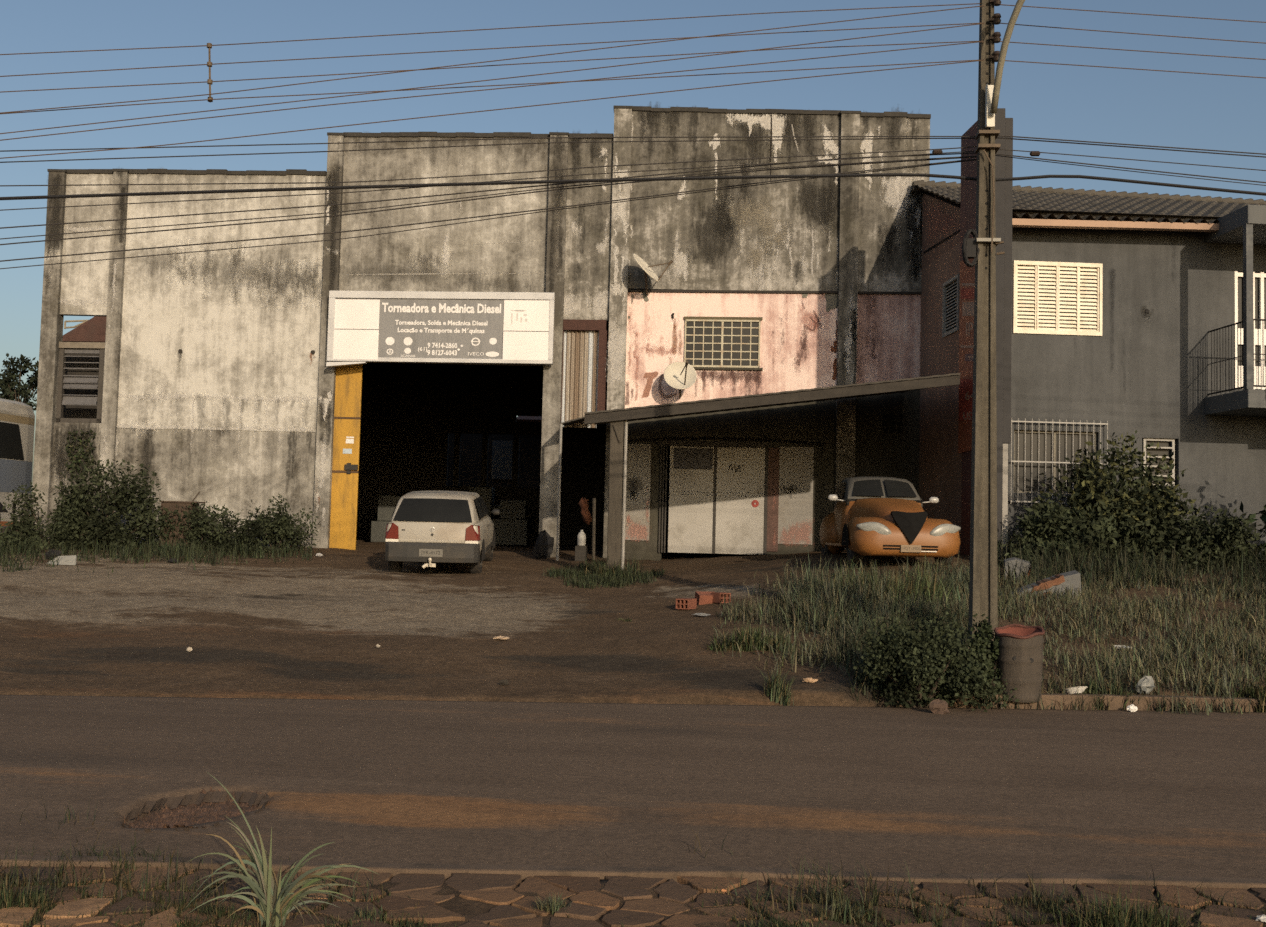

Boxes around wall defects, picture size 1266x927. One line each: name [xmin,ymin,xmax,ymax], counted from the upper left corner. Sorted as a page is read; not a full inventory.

leakage [48,175,104,250]
leakage [116,171,125,242]
leakage [328,168,339,288]
leakage [631,105,734,281]
peeling [727,113,787,163]
leakage [751,181,833,290]
leakage [784,114,814,161]
peeling [818,125,840,185]
leakage [860,110,923,279]
leakage [55,384,331,485]